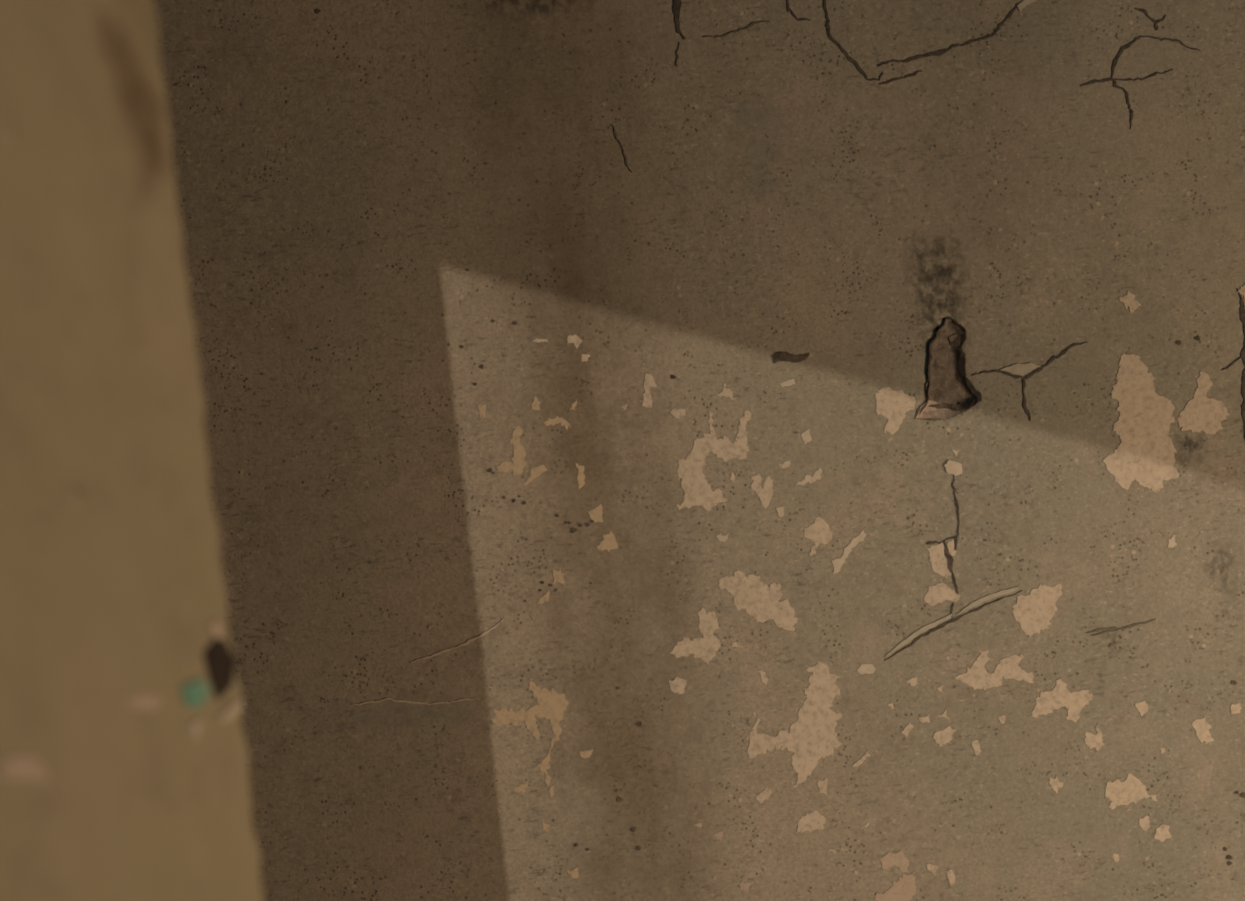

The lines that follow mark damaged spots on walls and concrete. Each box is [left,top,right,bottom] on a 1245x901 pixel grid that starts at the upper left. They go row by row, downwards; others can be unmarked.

crack [673,0,1036,85]
crack [1080,8,1200,129]
crack [613,125,632,172]
peeling [677,410,751,511]
spalling [875,317,982,435]
crack [972,342,1088,421]
peeling [1103,352,1230,492]
crack [1221,288,1245,439]
peeling [717,568,798,632]
crack [884,475,1023,661]
peeling [746,661,842,795]
peeling [937,650,1105,753]